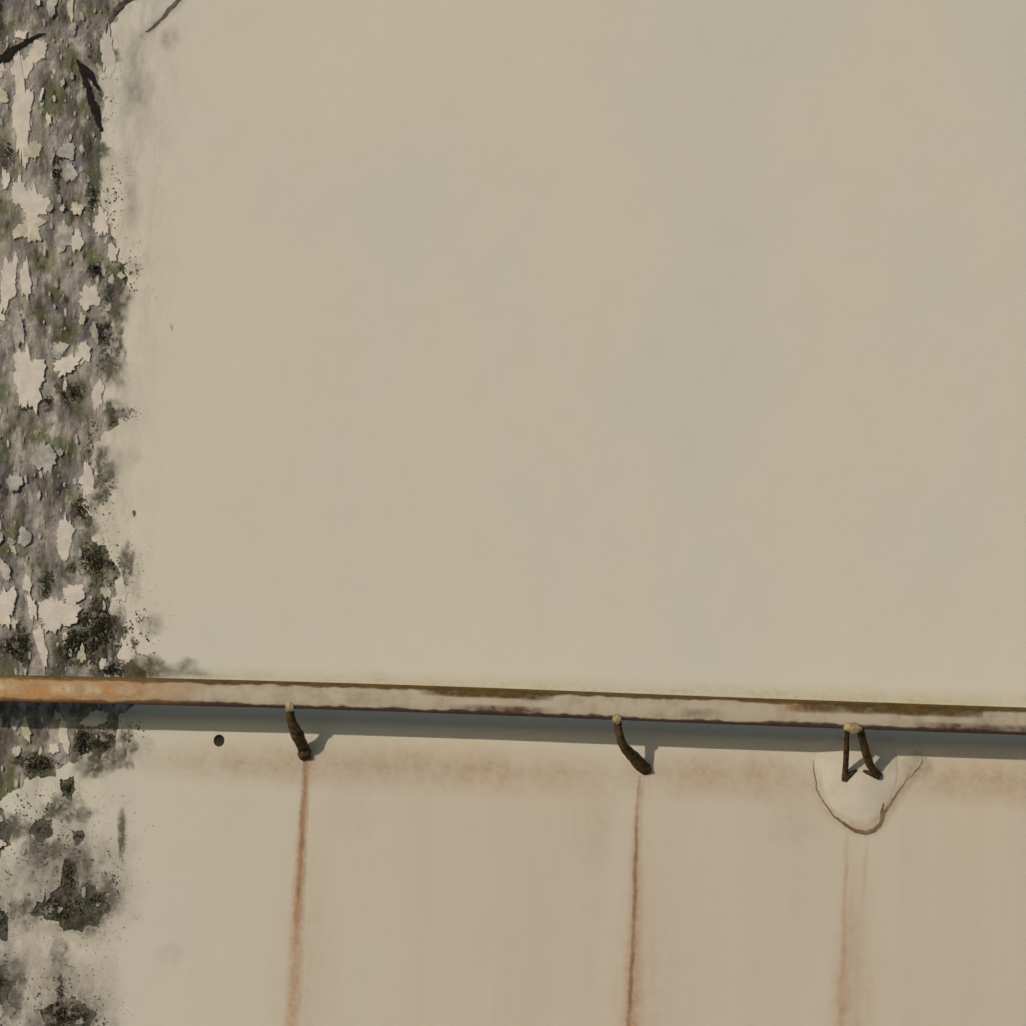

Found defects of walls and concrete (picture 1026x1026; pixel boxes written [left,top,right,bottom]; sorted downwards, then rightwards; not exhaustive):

crack [105,0,132,33]
crack [145,0,181,32]
peeling [0,0,175,1026]
rust [0,675,1026,735]
rust [293,793,307,943]